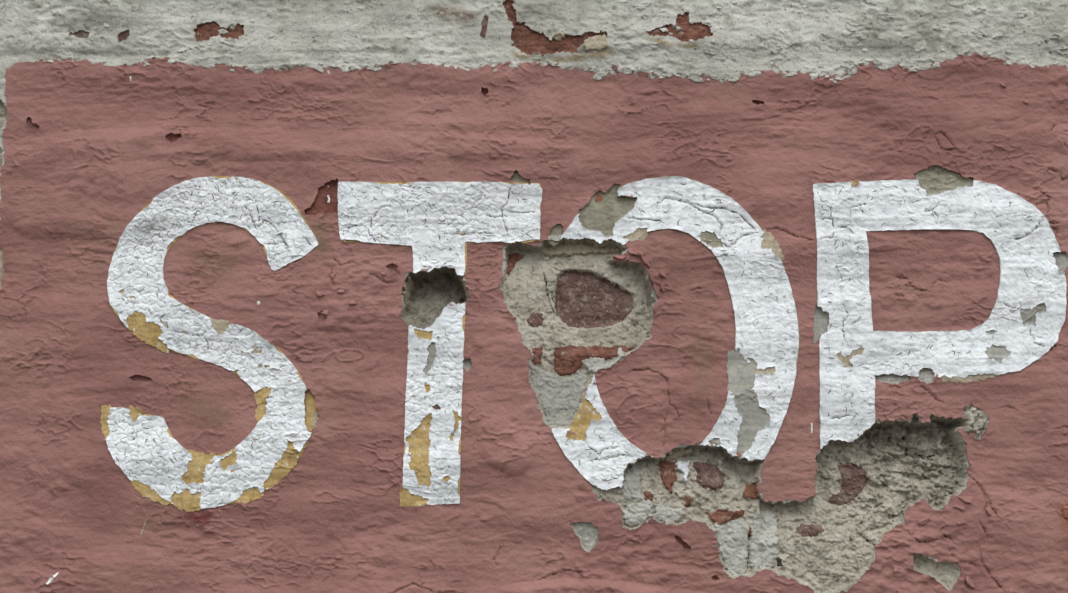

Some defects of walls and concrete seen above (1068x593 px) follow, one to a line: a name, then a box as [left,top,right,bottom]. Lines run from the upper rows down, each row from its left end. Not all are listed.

peeling [43,23,130,62]
flaking render [127,10,399,74]
flaking render [442,0,1035,83]
peeling [126,311,169,353]
flaking render [381,263,469,392]
flaking render [499,184,666,441]
peeling [254,386,271,422]
peeling [305,389,320,431]
peeling [130,450,237,512]
peeling [237,441,301,504]
peeling [399,404,462,507]
flaking render [591,347,990,593]